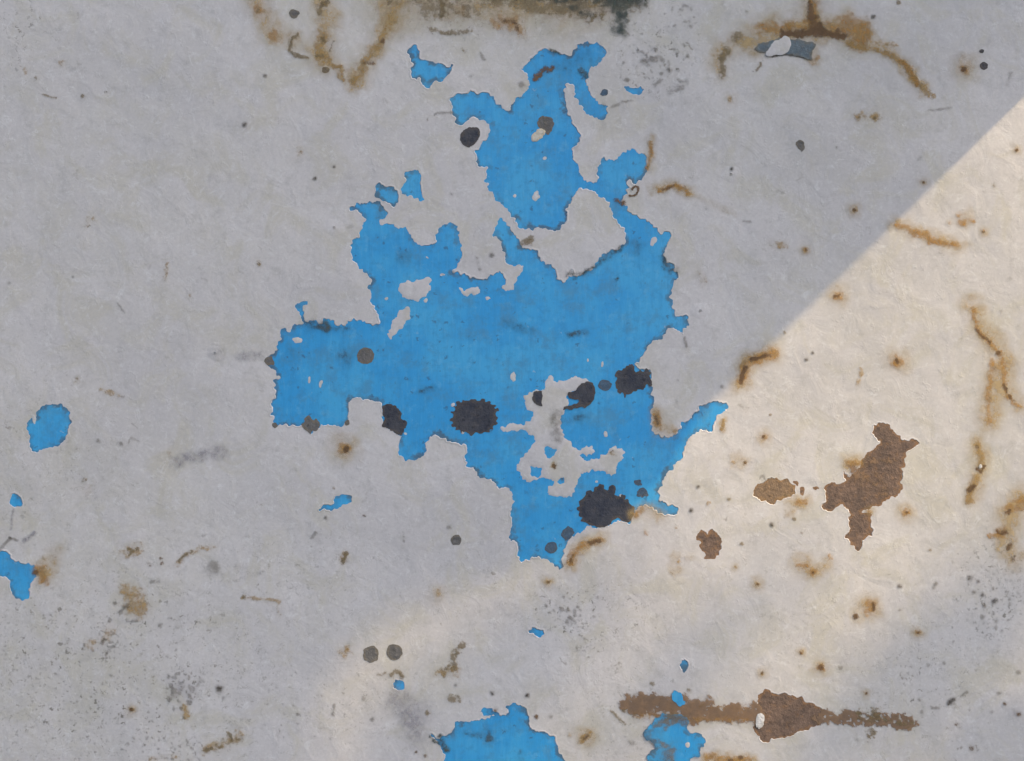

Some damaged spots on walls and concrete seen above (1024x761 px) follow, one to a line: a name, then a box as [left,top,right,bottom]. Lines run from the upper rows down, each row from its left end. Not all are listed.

corrosion [288,0,404,90]
corrosion [716,0,935,98]
corrosion [894,220,957,246]
peeling [263,40,730,571]
corrosion [972,307,1021,425]
peeling [25,402,74,455]
corrosion [966,440,985,503]
corrosion [987,491,1024,559]
peeling [0,548,38,602]
peeling [429,702,568,761]
peeling [641,689,707,761]